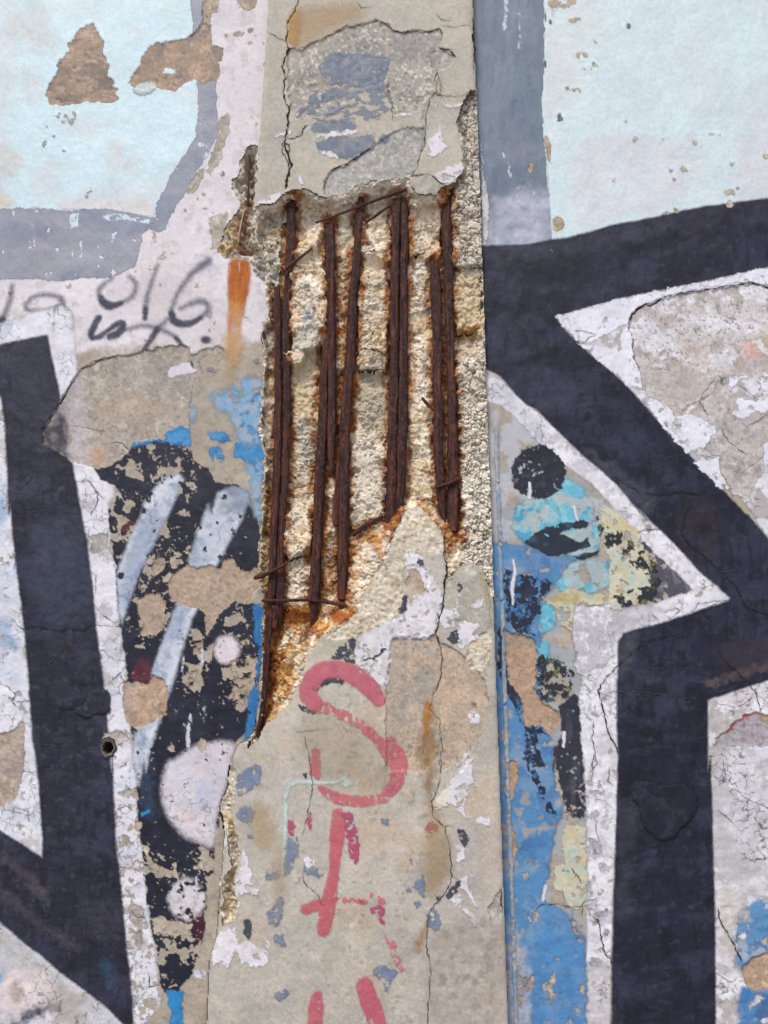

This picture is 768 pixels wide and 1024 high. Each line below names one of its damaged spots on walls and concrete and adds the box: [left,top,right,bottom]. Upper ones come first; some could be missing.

peeling [42,23,119,148]
peeling [130,0,257,96]
crack [269,0,476,188]
spalling [125,20,562,774]
corrosion [254,185,477,737]
peeling [628,283,768,499]
peeling [102,675,169,744]
crack [426,531,461,1024]
peeling [504,761,519,859]
peeling [572,604,613,680]
crack [591,481,768,840]
peeling [128,904,193,948]